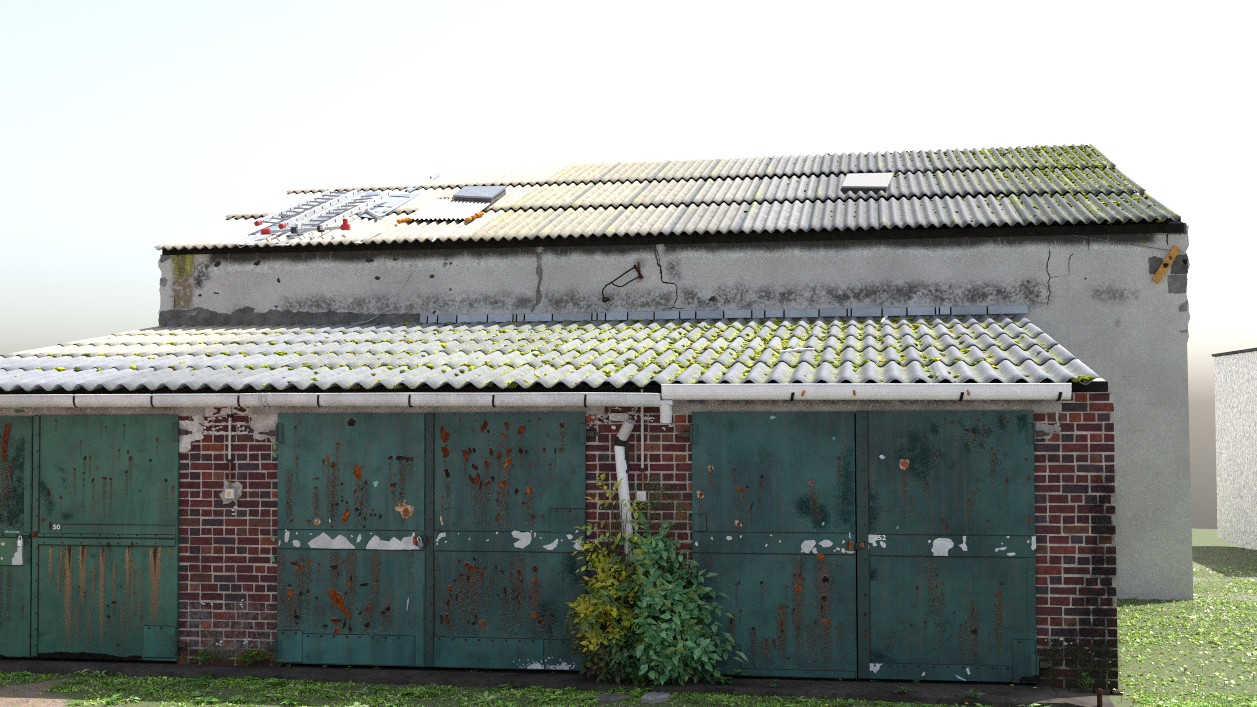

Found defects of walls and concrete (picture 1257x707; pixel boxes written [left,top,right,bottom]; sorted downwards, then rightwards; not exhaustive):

leakage [173,253,650,314]
crack [531,251,543,313]
leakage [548,294,669,310]
leakage [684,283,1042,307]
crack [1046,243,1089,305]
spalling [1148,254,1188,311]
spalling [179,407,278,452]
rust [287,443,414,528]
rust [440,417,565,522]
peeling [278,519,419,550]
peeling [928,536,968,556]
rust [285,558,394,633]